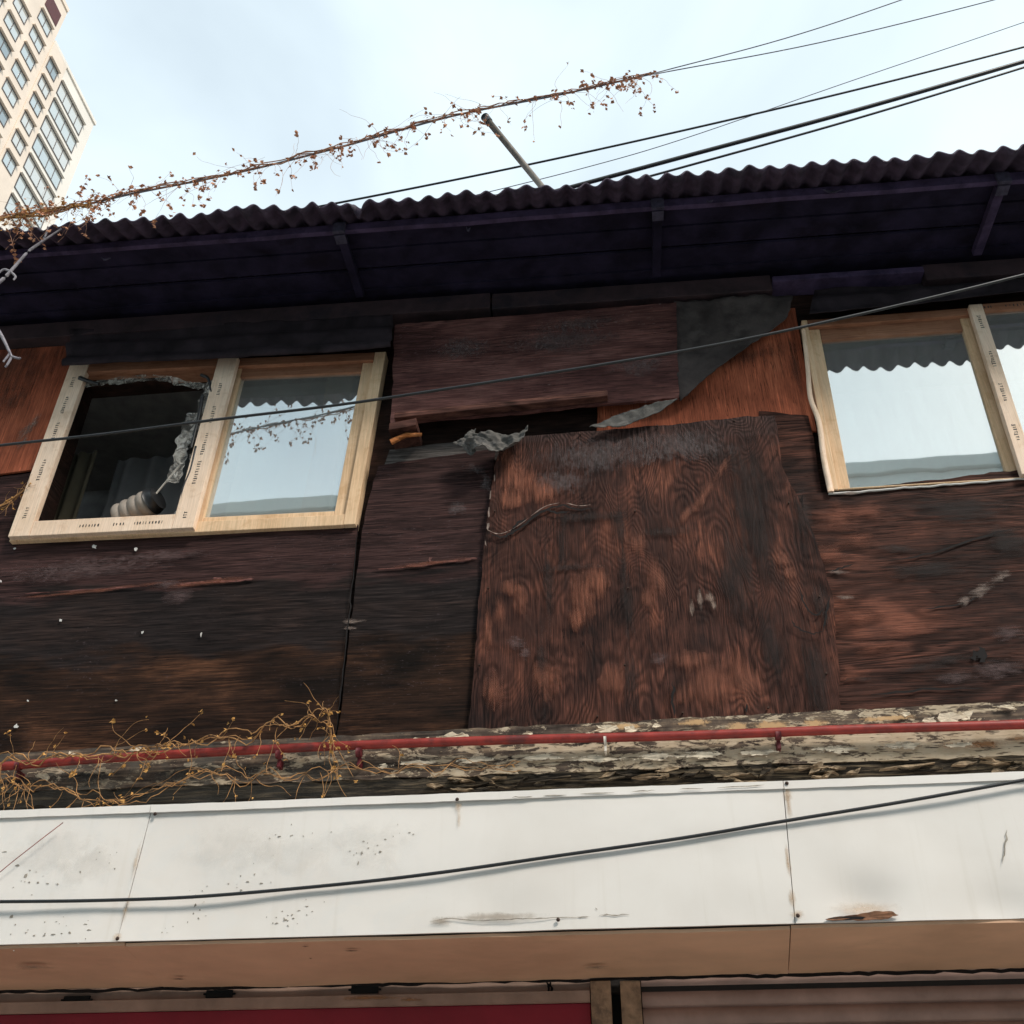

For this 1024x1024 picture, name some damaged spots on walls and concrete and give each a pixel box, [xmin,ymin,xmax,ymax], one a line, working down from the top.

peeling [865,712,910,721]
peeling [922,710,973,722]
peeling [587,724,639,733]
peeling [729,721,786,729]
peeling [456,755,495,763]
peeling [523,751,723,763]
peeling [740,748,779,757]
peeling [808,745,858,754]
peeling [378,759,436,769]
rust [826,911,897,921]